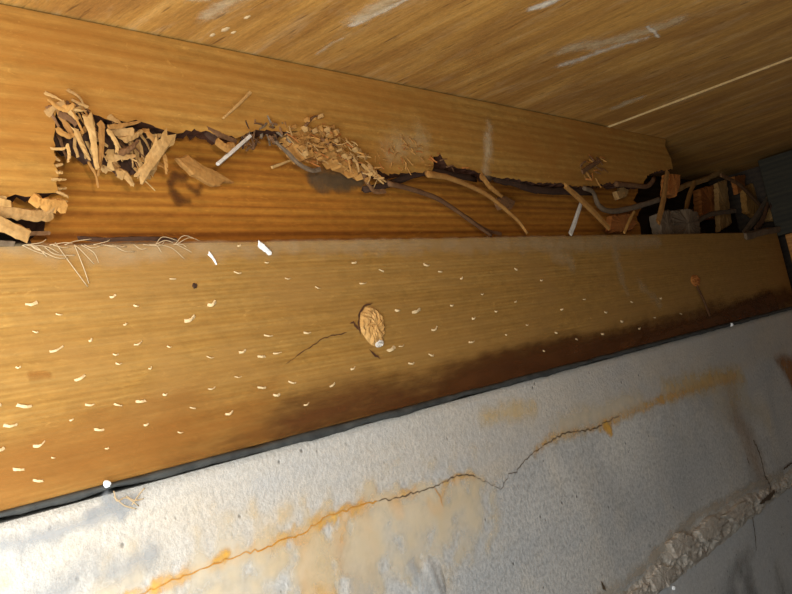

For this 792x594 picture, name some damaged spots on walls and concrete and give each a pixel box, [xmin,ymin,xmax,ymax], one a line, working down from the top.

peeling [174,155,234,187]
leakage [0,289,792,489]
corrosion [150,473,480,594]
crack [143,416,619,594]
spalling [601,468,792,594]